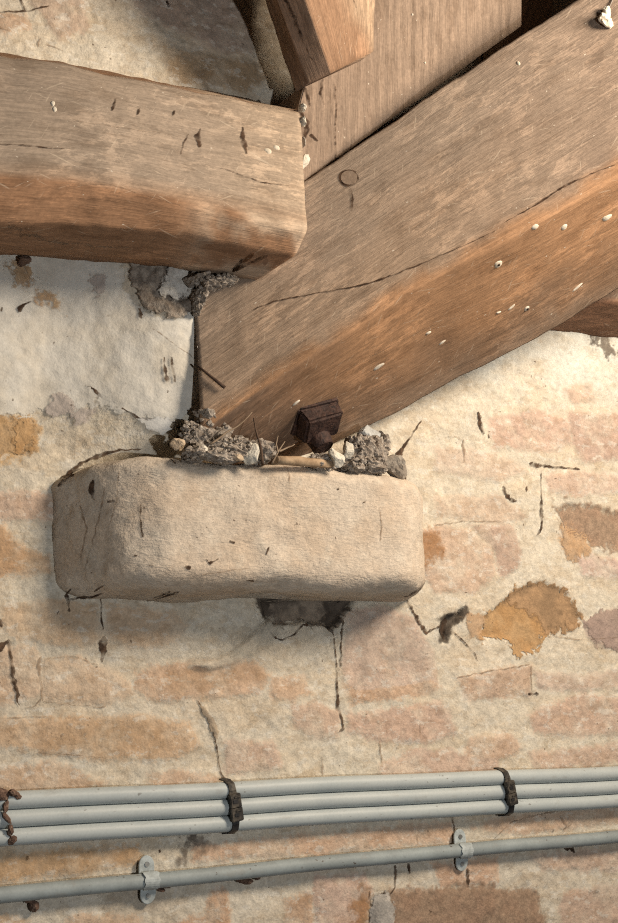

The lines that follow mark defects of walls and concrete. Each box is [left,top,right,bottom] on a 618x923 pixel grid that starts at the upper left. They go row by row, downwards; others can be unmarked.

crack [3,0,49,29]
peeling [0,255,199,456]
crack [396,421,422,479]
crack [455,412,490,455]
crack [503,462,580,534]
crack [0,619,48,718]
crack [265,602,345,732]
crack [406,580,532,680]
crack [198,701,225,778]